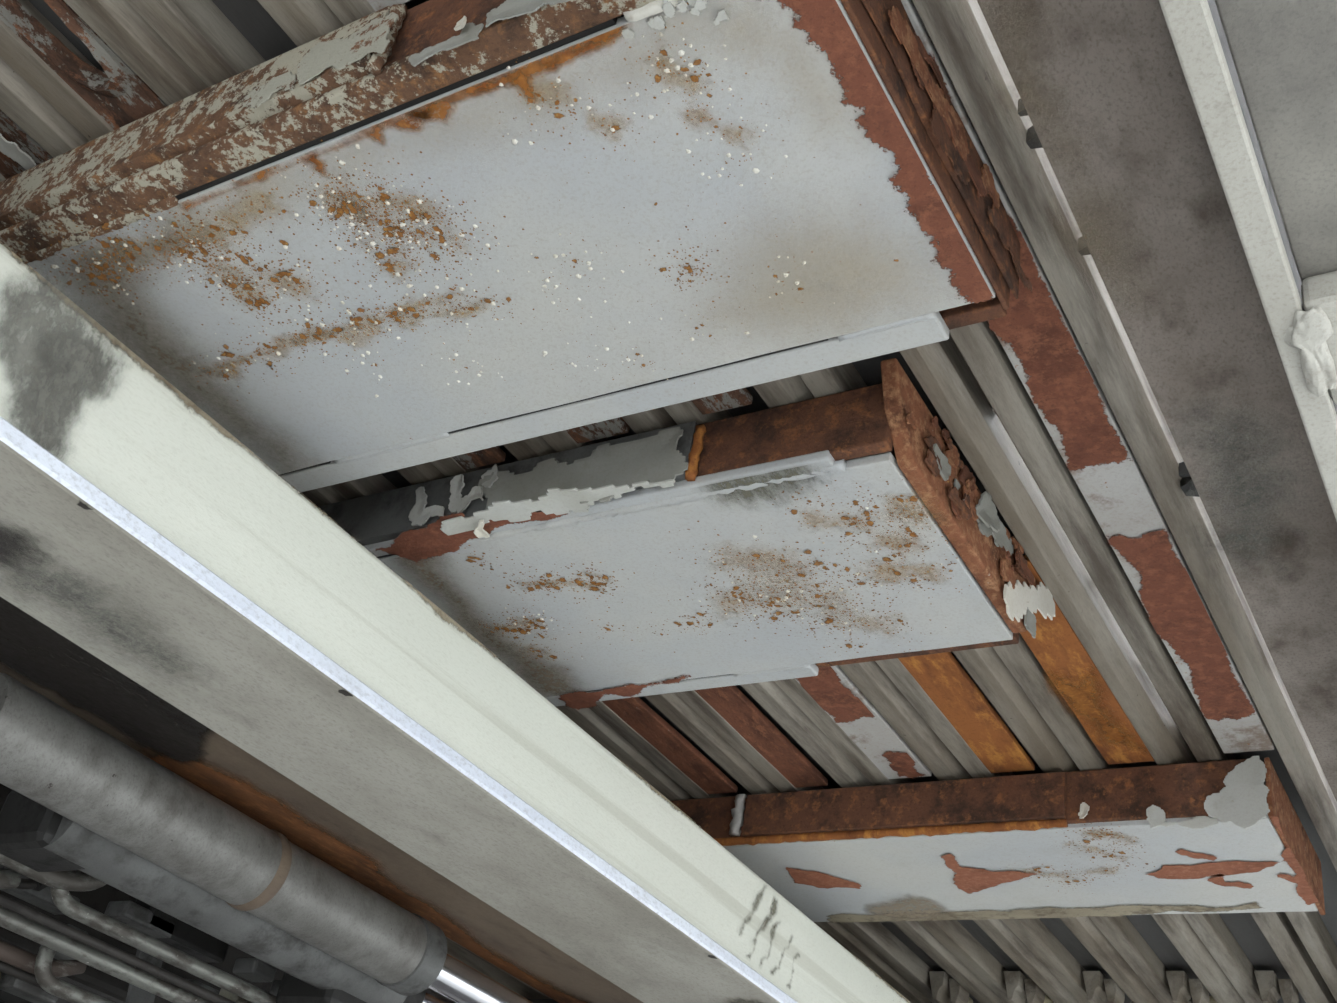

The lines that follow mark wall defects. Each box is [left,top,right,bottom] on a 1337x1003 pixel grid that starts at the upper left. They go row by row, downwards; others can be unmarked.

peeling [408,0,570,67]
corrosion [35,2,813,401]
corrosion [777,0,993,304]
corrosion [888,6,1133,471]
damp [0,241,267,465]
damp [0,528,28,567]
damp [21,574,177,667]
damp [0,597,211,763]
peeling [408,427,688,538]
corrosion [375,411,1034,723]
peeling [941,854,1036,894]
peeling [1146,756,1319,905]